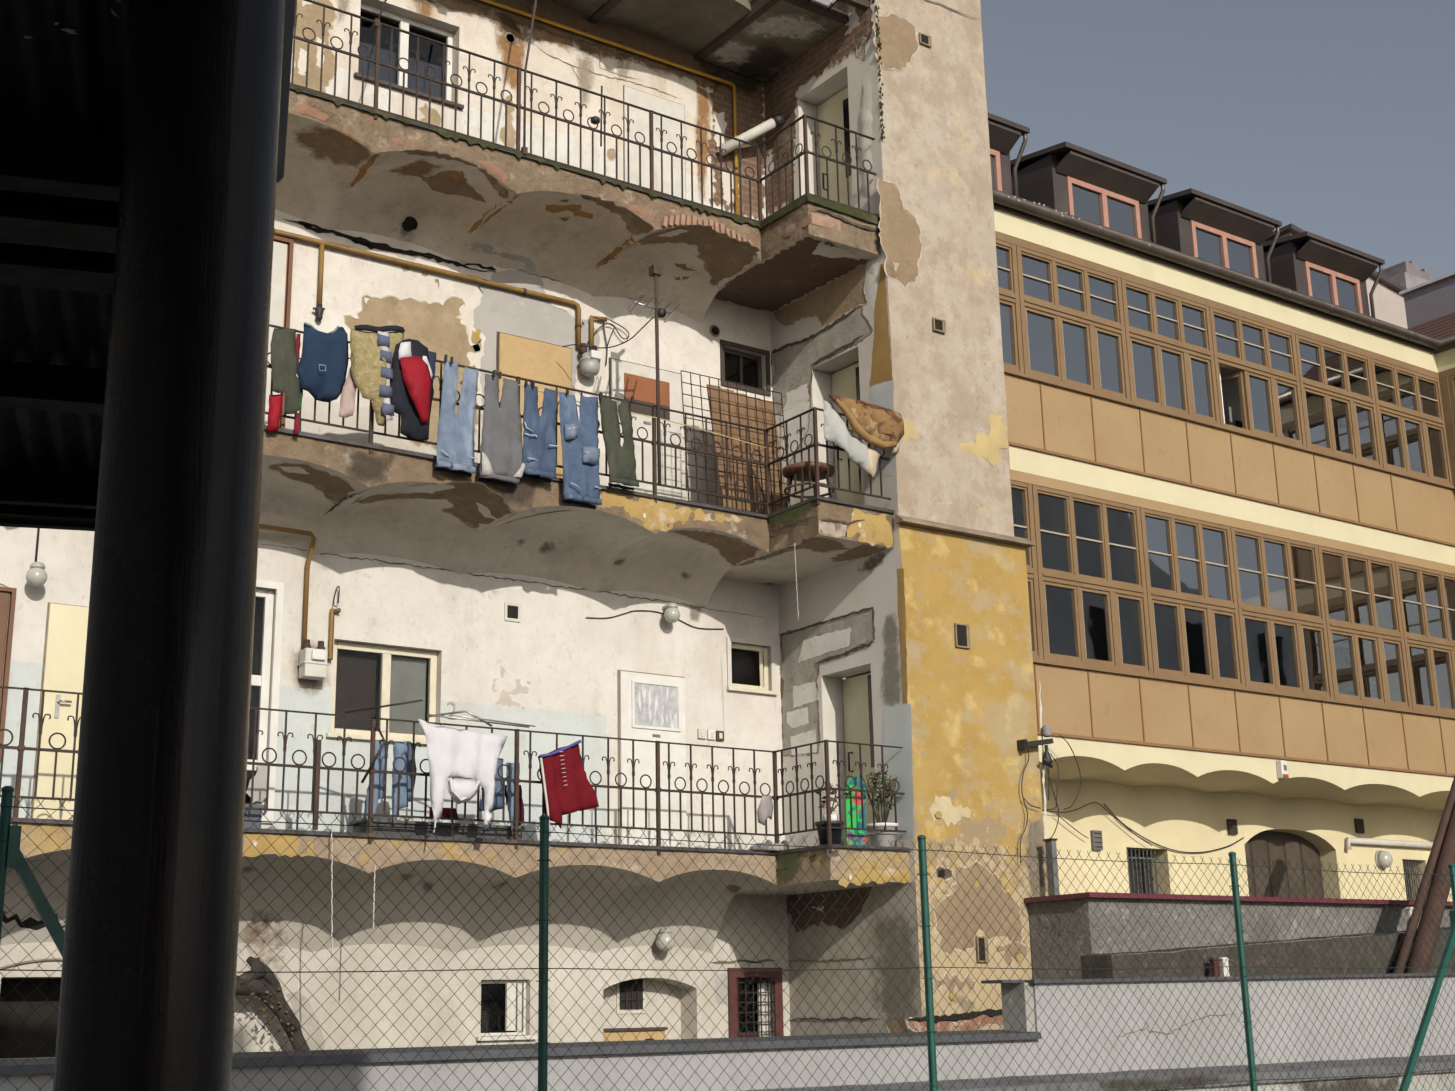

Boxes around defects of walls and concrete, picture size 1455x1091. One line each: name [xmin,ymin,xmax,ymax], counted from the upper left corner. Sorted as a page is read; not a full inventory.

flaking render [290,0,337,121]
peeling [499,95,516,149]
spalling [390,137,519,203]
spalling [402,216,418,232]
crack [284,196,654,288]
flaking render [545,0,932,464]
spalling [344,287,483,450]
spalling [268,462,517,532]
spalling [600,491,893,567]
spalling [954,623,971,649]
spalling [929,795,973,826]
spalling [786,866,910,934]